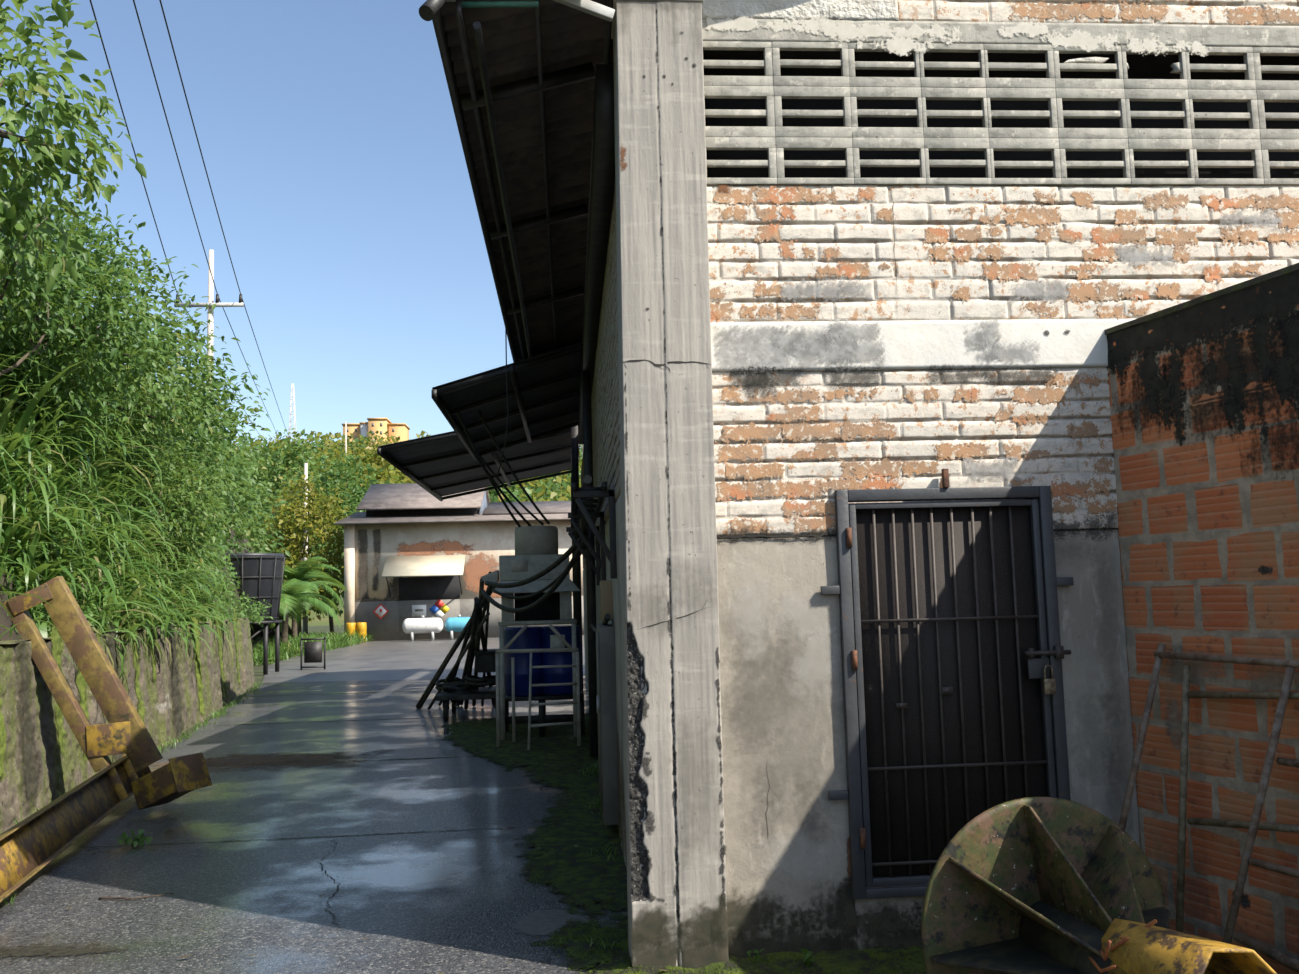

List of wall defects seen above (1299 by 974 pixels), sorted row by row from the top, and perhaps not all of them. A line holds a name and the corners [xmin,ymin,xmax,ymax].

peeling [706,16,963,56]
peeling [998,0,1211,56]
peeling [923,191,1299,335]
damp [1115,244,1178,266]
damp [1106,270,1299,471]
peeling [715,385,1051,536]
peeling [398,540,501,598]
damp [0,634,39,805]
damp [148,620,184,736]
damp [205,752,380,771]
spalling [626,470,680,923]
damp [631,878,923,969]